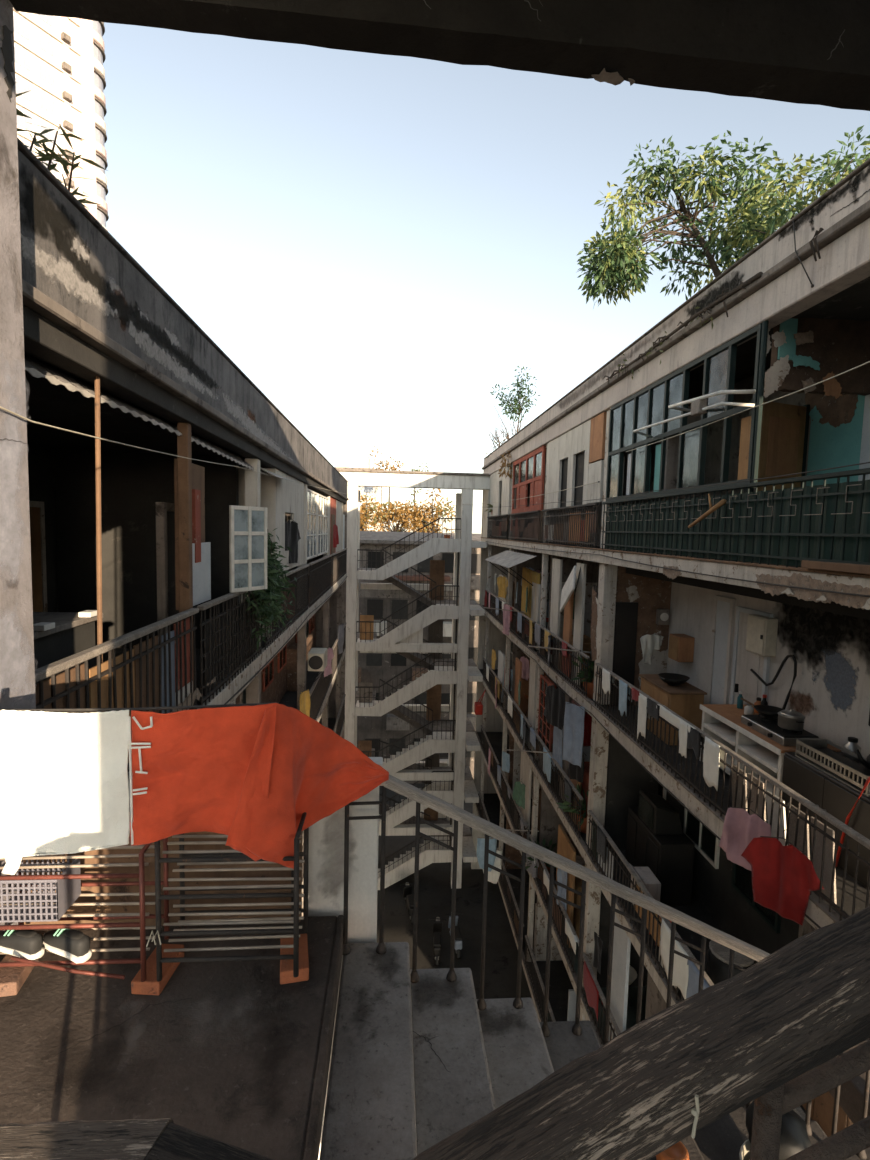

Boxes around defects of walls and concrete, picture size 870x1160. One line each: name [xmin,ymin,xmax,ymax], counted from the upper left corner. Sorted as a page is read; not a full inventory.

spalling [592,68,635,86]
leakage [20,167,219,388]
peeling [763,328,858,428]
spalling [756,573,870,610]